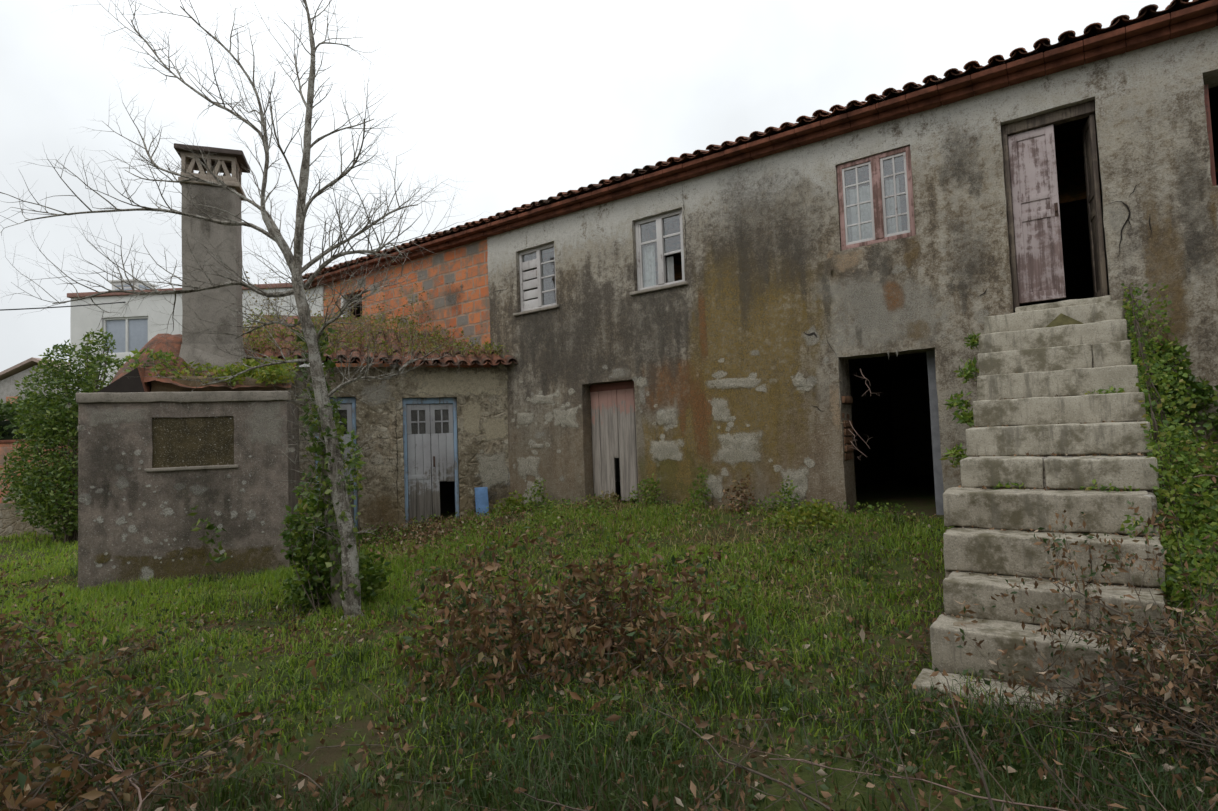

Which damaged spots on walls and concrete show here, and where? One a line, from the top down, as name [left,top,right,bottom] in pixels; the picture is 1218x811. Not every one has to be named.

crack [1109,183,1152,256]
spalling [705,358,816,506]